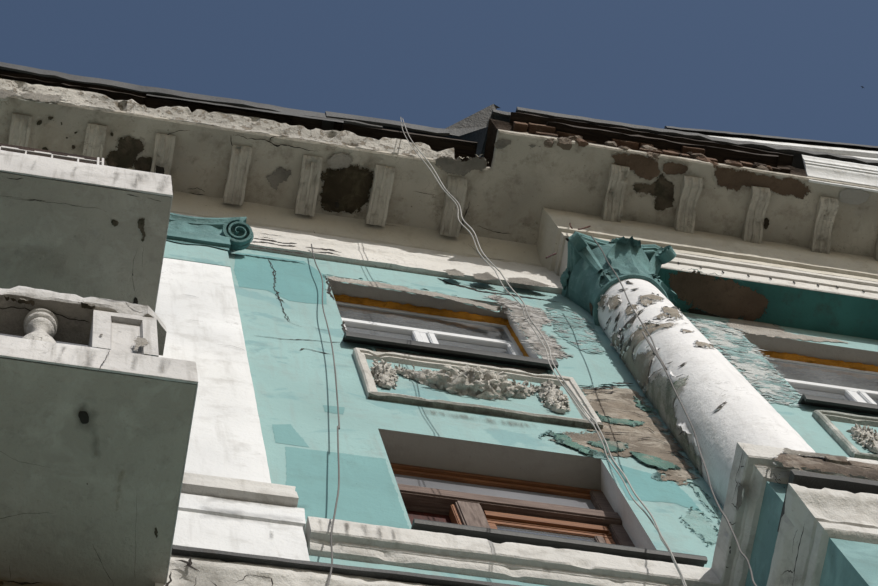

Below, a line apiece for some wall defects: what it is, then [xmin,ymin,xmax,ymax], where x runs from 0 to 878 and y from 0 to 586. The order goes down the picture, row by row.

flaking render [0,88,68,104]
flaking render [105,132,153,172]
flaking render [317,151,374,215]
spalling [432,153,489,177]
flaking render [494,121,812,211]
crack [220,230,347,354]
crack [325,276,358,300]
crack [0,306,88,322]
peeling [323,268,849,546]
flaking render [768,448,878,480]
crack [165,557,273,586]
crack [782,527,804,585]